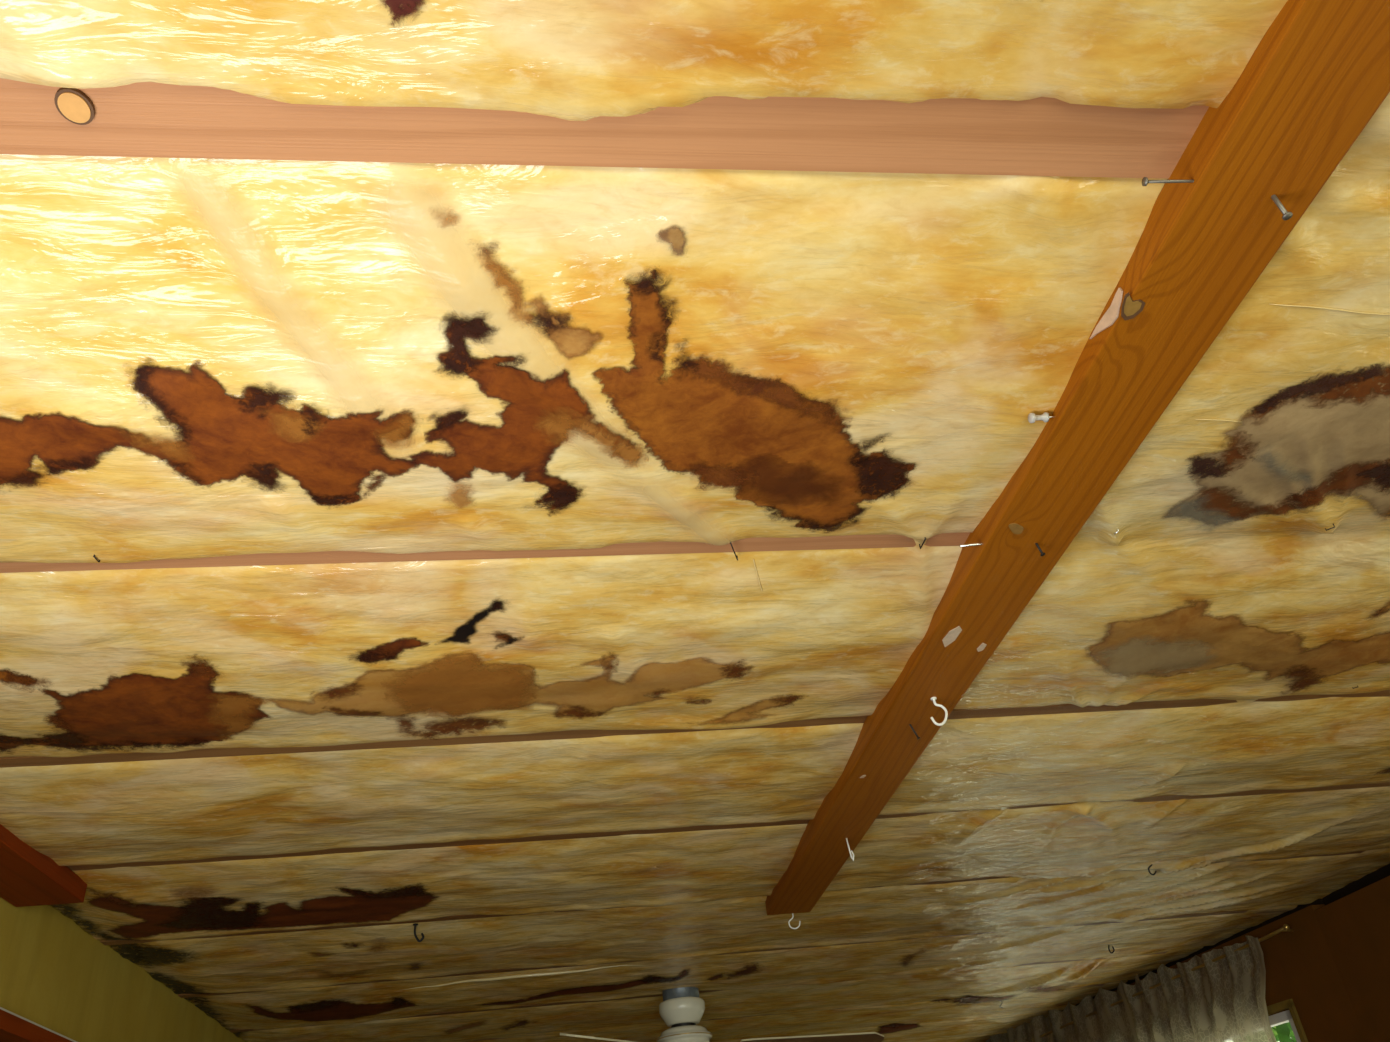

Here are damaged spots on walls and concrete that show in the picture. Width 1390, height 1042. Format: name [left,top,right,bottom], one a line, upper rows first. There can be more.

water stain [381,0,424,26]
water stain [0,246,915,533]
water stain [1164,364,1390,526]
water stain [0,601,752,755]
water stain [708,695,798,724]
water stain [1089,601,1390,693]
water stain [49,885,437,1038]